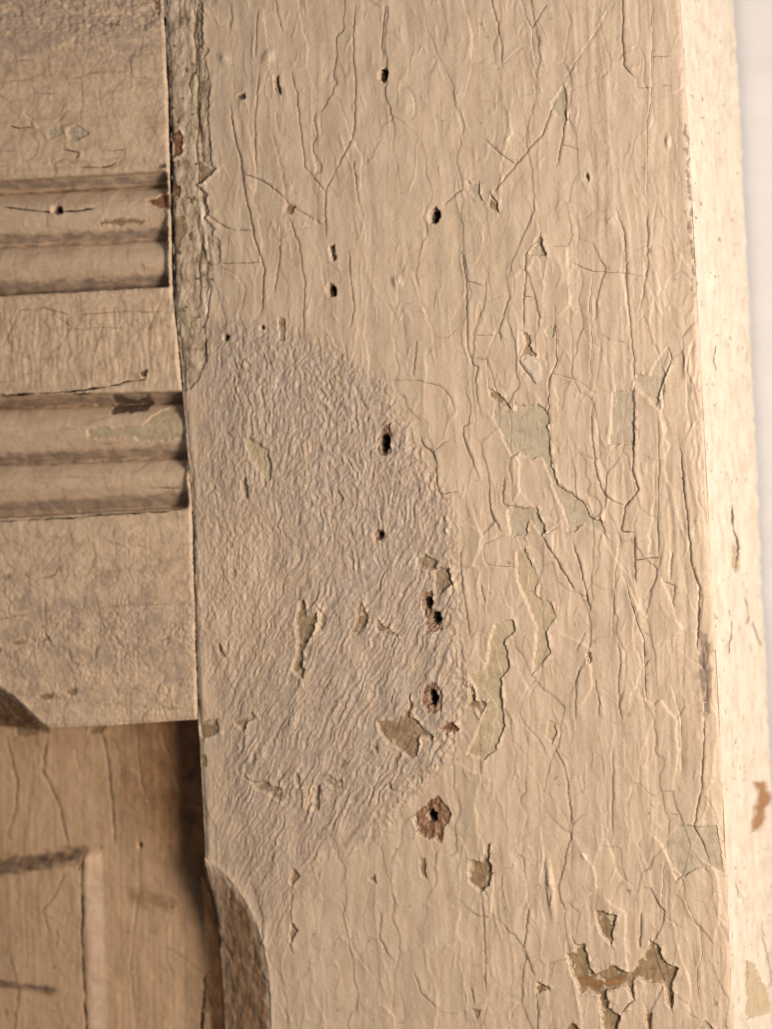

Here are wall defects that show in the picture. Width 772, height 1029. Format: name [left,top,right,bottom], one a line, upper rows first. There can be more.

crack [0,0,359,346]
peeling [146,0,222,391]
crack [0,379,183,409]
crack [389,237,540,636]
crack [487,0,711,864]
peeling [292,599,327,680]
peeling [372,615,519,761]
peeling [507,503,559,678]
crack [731,505,740,569]
crack [42,742,89,1029]
peeling [469,843,497,895]
peeling [567,910,683,1029]